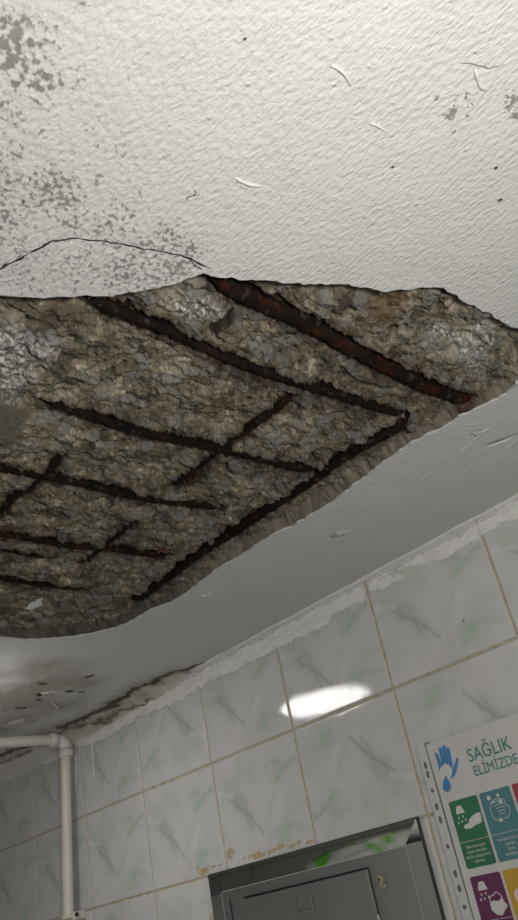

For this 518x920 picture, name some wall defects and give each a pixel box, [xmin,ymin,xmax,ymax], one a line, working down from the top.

peeling [0,9,85,104]
peeling [504,94,518,123]
crack [0,237,212,270]
rust [205,274,472,405]
spalling [0,140,518,639]
rust [42,295,410,601]
rust [0,455,223,514]
rust [0,523,169,560]
rust [0,575,82,590]
damp [53,663,203,732]
damp [0,746,32,764]